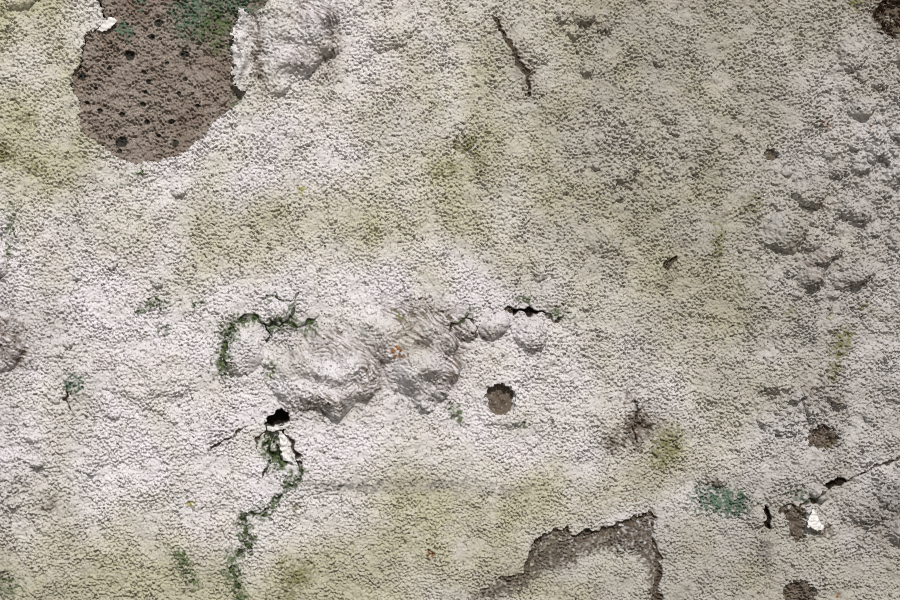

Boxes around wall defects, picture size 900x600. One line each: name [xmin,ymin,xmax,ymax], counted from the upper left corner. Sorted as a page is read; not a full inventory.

spalling [71,0,268,165]
crack [492,16,531,97]
spalling [864,0,900,44]
crack [213,292,319,379]
crack [504,306,563,323]
spalling [484,383,513,415]
spalling [805,425,844,450]
crack [210,408,308,600]
crack [764,456,900,529]
peeling [481,512,661,600]
spalling [783,580,815,600]